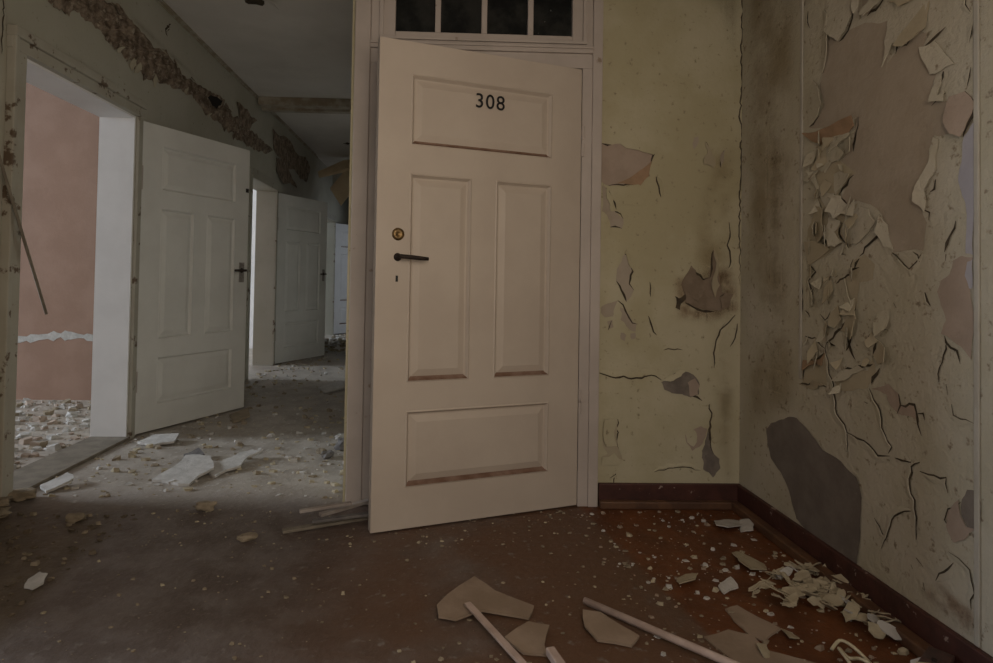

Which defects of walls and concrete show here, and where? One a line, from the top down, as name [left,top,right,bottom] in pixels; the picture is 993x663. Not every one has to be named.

flaking render [48,0,310,188]
peeling [601,137,658,228]
peeling [801,0,974,370]
peeling [675,247,733,313]
crack [892,252,930,307]
crack [600,282,682,380]
crack [713,315,740,368]
flaking render [662,370,720,477]
crack [802,263,974,610]